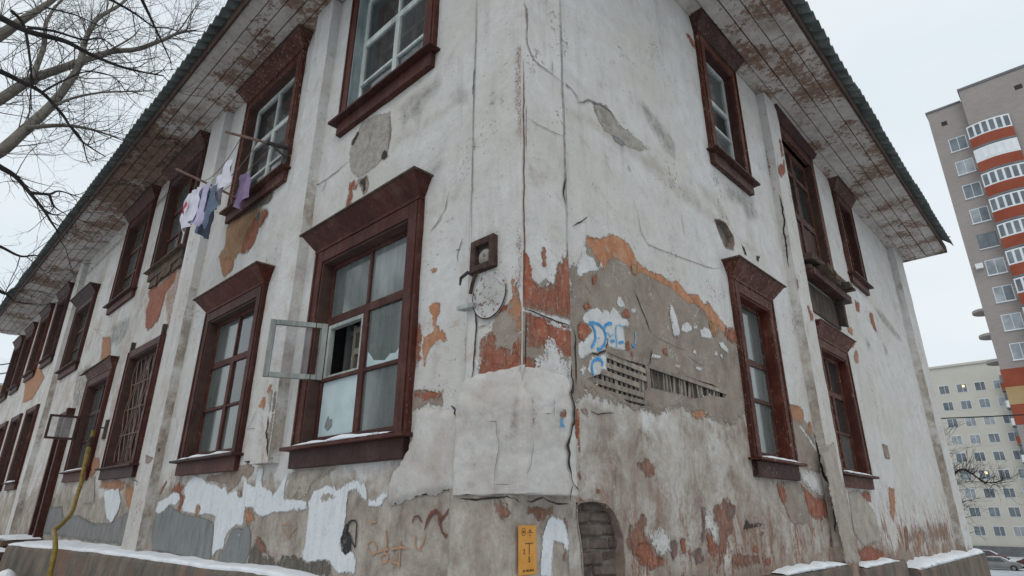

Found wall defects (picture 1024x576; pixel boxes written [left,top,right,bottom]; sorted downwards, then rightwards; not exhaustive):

flaking render [345,111,392,206]
flaking render [579,99,647,151]
peeling [219,191,276,277]
crack [460,4,587,505]
crack [632,197,716,269]
crack [779,195,789,267]
peeling [145,271,176,330]
peeling [415,302,446,368]
peeling [464,233,746,452]
peeling [151,463,388,574]
flaking render [528,489,771,576]
crack [814,434,836,547]